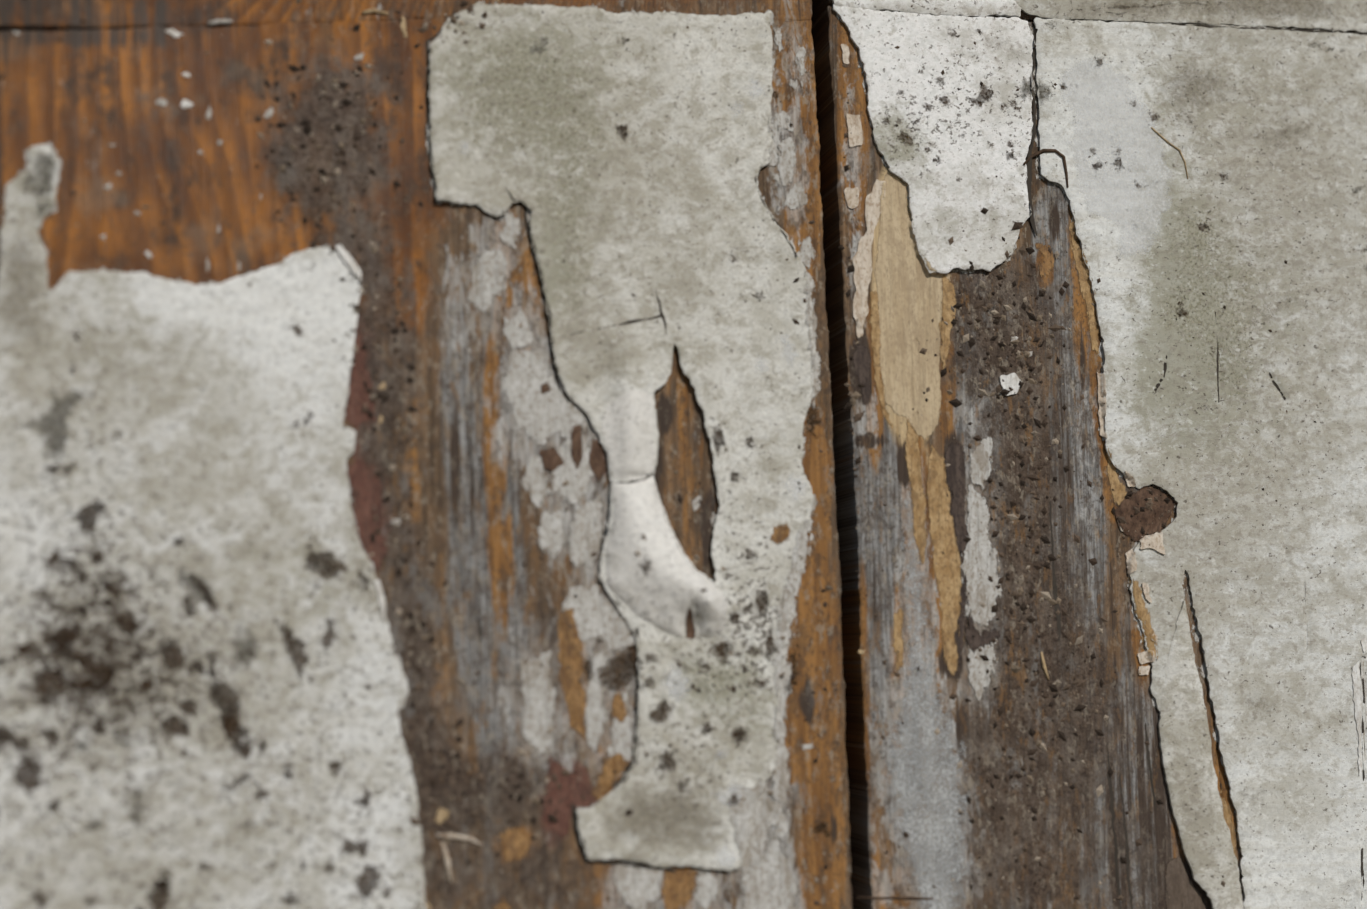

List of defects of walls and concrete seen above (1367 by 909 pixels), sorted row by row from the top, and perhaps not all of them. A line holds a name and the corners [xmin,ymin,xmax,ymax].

peeling [155,98,211,120]
peeling [0,142,449,909]
peeling [426,0,821,909]
peeling [832,0,1367,909]
crack [1359,656,1367,781]